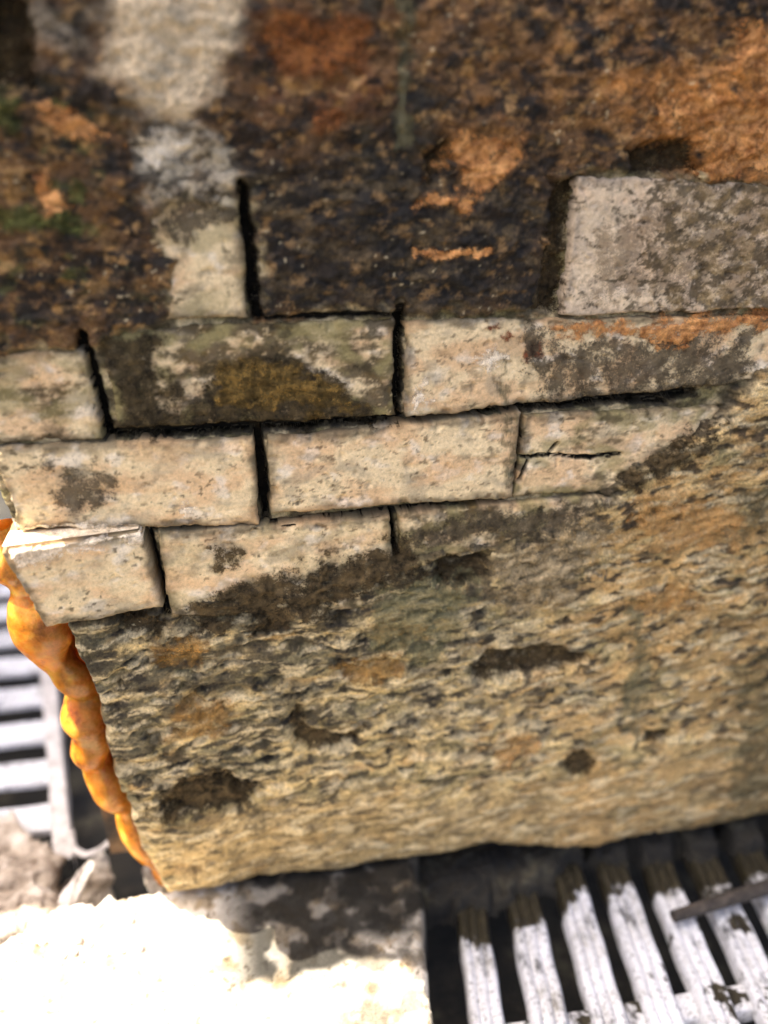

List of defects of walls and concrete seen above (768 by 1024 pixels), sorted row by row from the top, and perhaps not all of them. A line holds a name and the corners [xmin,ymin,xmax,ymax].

leakage [702,308,768,317]
leakage [471,383,517,486]
crack [466,387,690,478]
leakage [257,481,358,519]
leakage [498,492,586,500]
leakage [204,545,247,574]